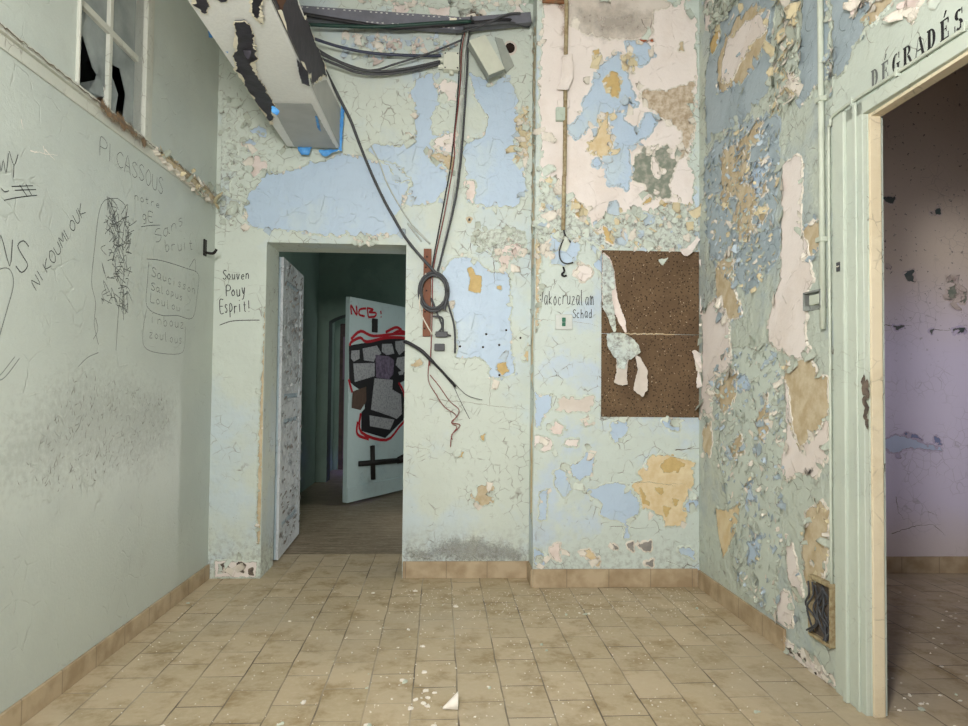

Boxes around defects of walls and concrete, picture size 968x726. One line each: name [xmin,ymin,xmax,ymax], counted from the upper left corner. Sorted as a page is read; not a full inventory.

crack [0,23,212,193]
peeling [153,0,943,687]
peeling [942,274,968,310]
peeling [951,325,968,336]